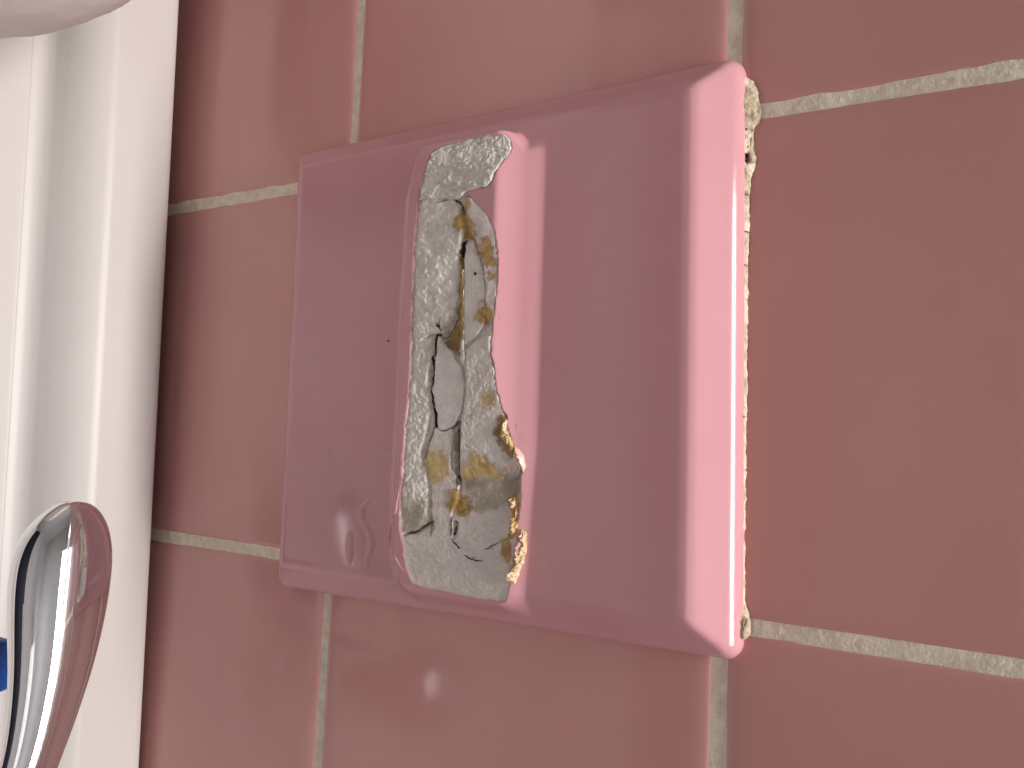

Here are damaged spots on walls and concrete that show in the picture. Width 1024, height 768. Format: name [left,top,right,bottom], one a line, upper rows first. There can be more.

crack [430,199,468,491]
spalling [400,134,522,602]
crack [406,517,500,561]